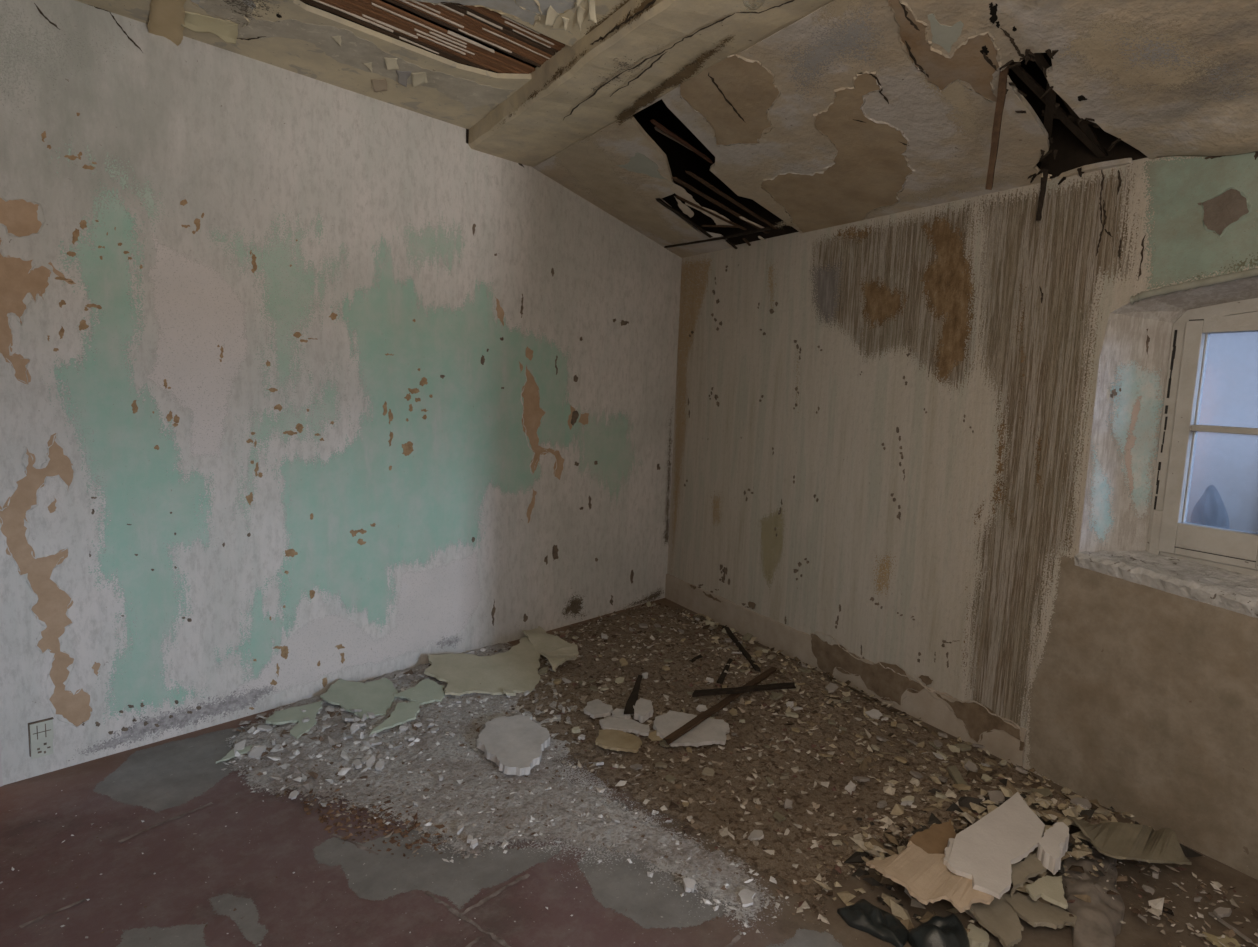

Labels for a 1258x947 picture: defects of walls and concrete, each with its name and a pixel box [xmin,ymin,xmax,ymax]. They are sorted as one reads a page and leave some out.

peeling [411,0,597,36]
peeling [362,57,427,92]
leakage [497,0,664,129]
leakage [613,36,734,126]
peeling [0,196,76,385]
peeling [47,304,102,352]
peeling [131,400,180,427]
peeling [283,409,324,441]
peeling [519,346,579,523]
peeling [567,405,589,430]
peeling [760,71,1258,880]
peeling [0,432,289,813]